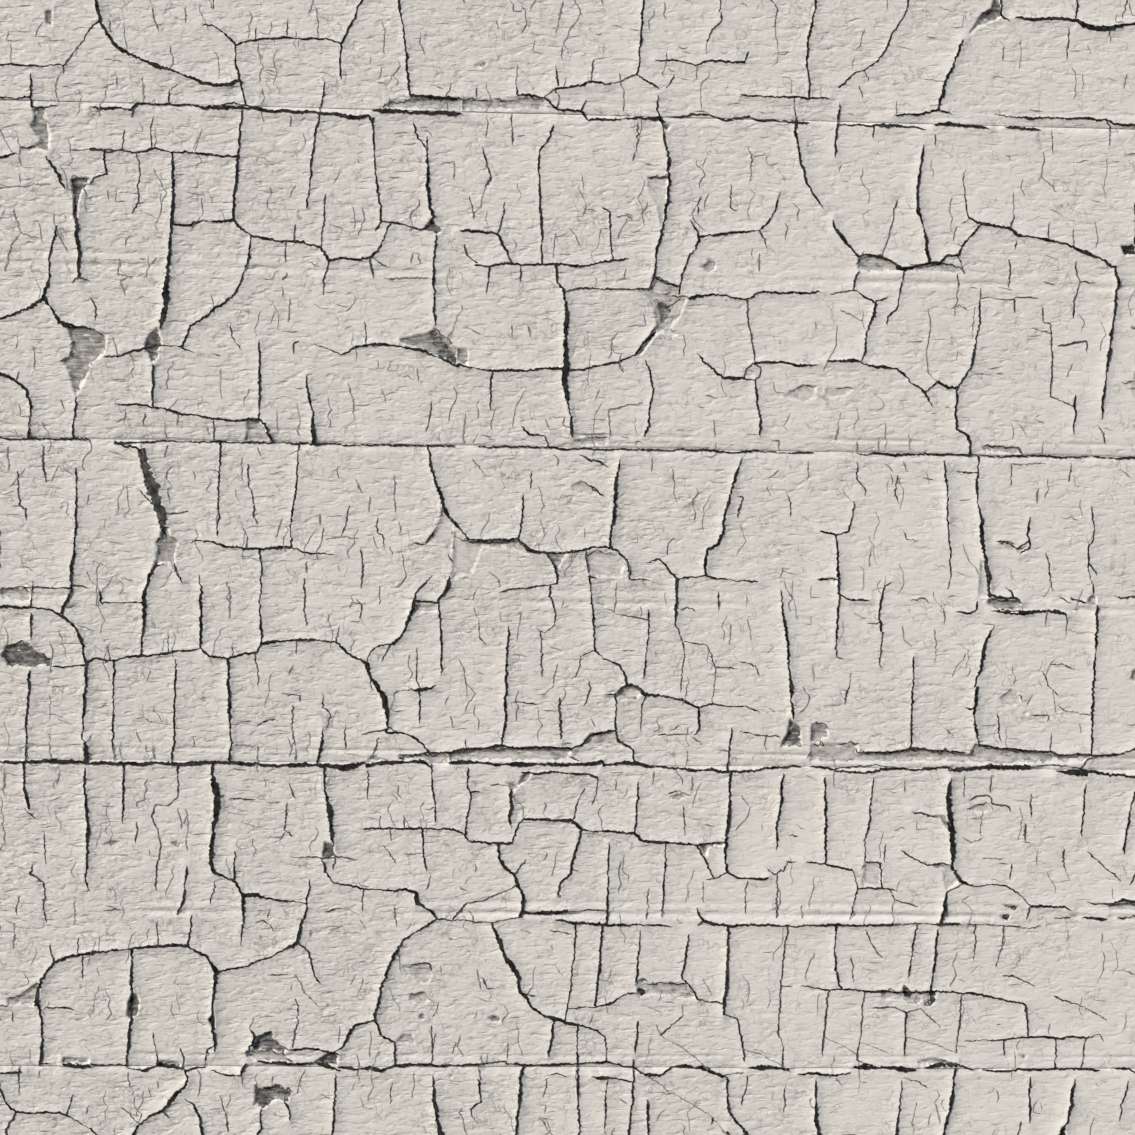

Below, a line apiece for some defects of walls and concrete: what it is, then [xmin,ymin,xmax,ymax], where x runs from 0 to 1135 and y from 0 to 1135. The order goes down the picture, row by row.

crack [314,0,1135,630]
peeling [59,325,105,390]
peeling [400,328,467,365]
peeling [0,640,51,667]
crack [0,342,1135,1135]
peeling [249,1031,292,1063]
peeling [255,1084,291,1108]